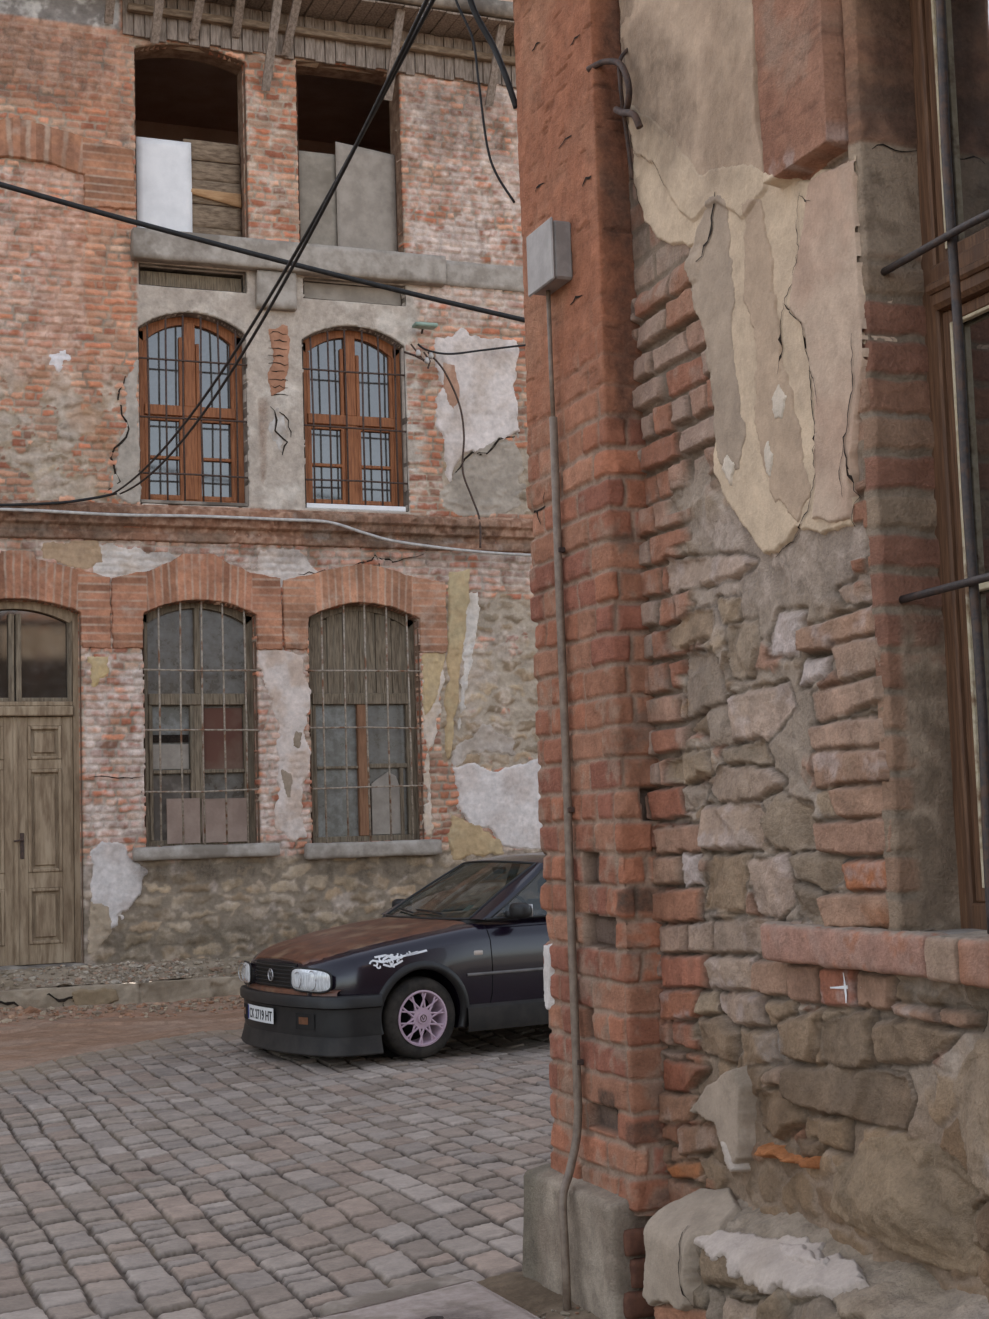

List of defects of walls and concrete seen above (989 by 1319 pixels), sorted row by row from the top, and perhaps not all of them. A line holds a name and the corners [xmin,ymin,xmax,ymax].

crack [696,192,715,261]
flaking render [619,0,897,555]
flaking render [434,328,526,517]
crack [776,195,861,557]
flaking render [253,649,311,842]
flaking render [416,569,543,860]
flaking render [87,841,148,954]
flaking render [690,1065,822,1174]
flaking render [623,1188,869,1319]